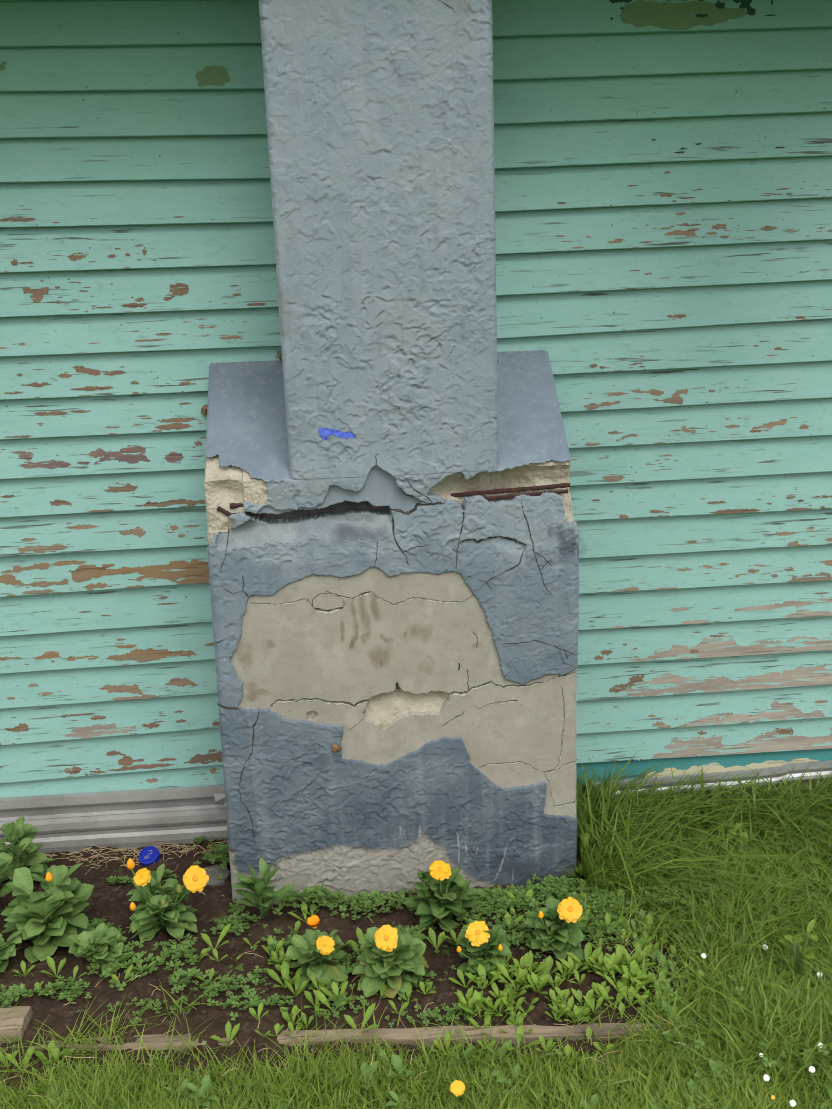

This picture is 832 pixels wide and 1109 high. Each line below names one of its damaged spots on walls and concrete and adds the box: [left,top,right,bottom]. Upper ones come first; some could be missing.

peeling [22,279,148,312]
peeling [4,343,203,435]
flaking render [0,435,577,605]
crack [219,476,552,614]
corrosion [451,483,570,500]
peeling [0,638,214,667]
peeling [64,748,223,785]
peeling [91,677,207,700]
crack [217,698,368,852]
crack [441,633,579,808]
spalling [230,560,832,818]
peeling [229,832,496,905]